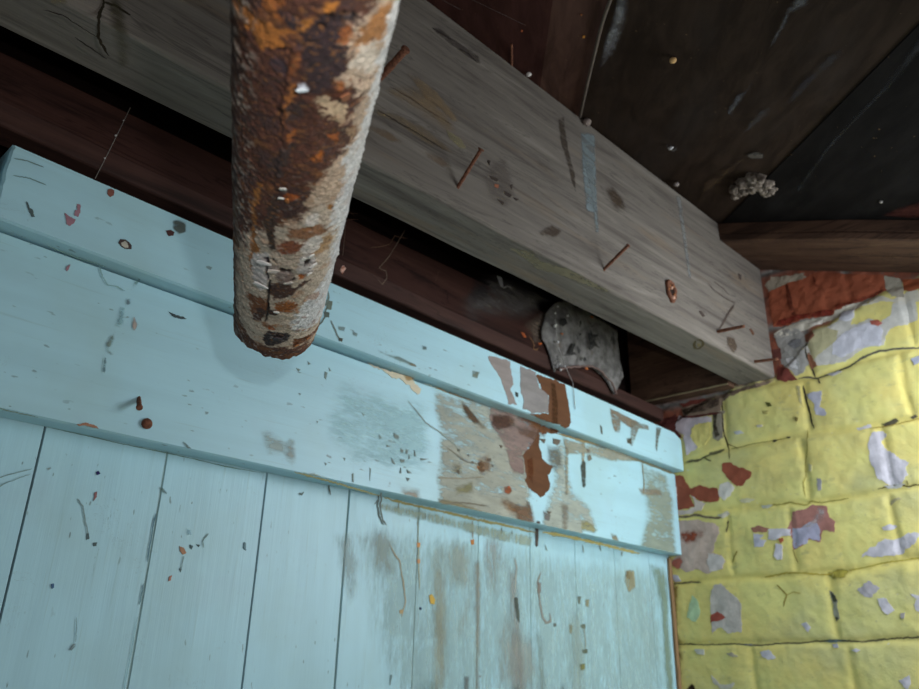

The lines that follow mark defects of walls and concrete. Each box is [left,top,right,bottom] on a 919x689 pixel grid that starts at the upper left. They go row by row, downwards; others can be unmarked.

peeling [488,356,549,474]
spalling [610,272,919,455]
crack [630,343,919,563]
peeling [856,415,919,485]
leakage [375,401,639,651]
peeling [672,462,752,582]
peeling [751,505,835,560]
peeling [862,524,919,557]
leakage [501,558,543,689]
peeling [710,583,742,633]
crack [679,590,919,646]
peeling [857,581,905,619]